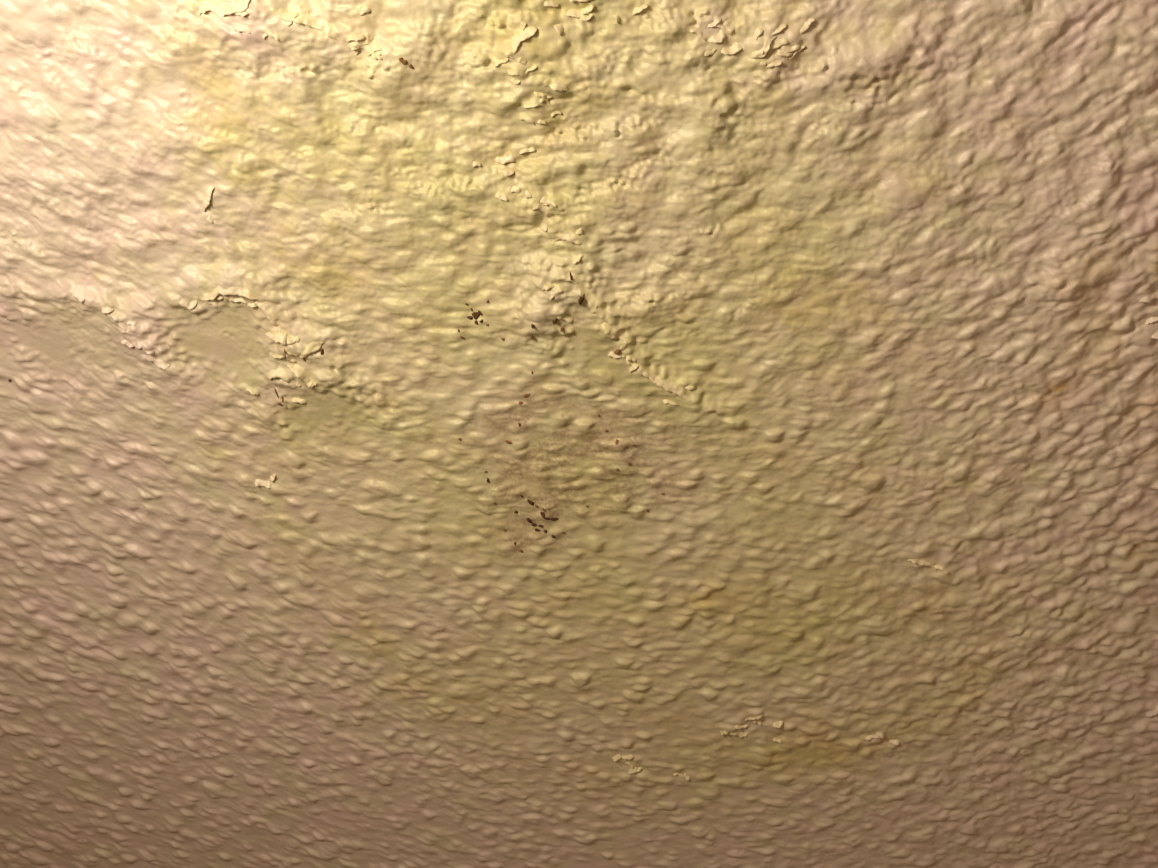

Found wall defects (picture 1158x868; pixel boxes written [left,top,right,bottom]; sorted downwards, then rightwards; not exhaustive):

peeling [199,0,280,41]
peeling [269,2,383,79]
peeling [494,22,538,84]
peeling [544,0,595,36]
peeling [614,4,649,24]
peeling [690,17,815,68]
peeling [520,76,569,125]
peeling [473,147,696,406]
water stain [465,300,489,326]
water stain [514,495,565,538]